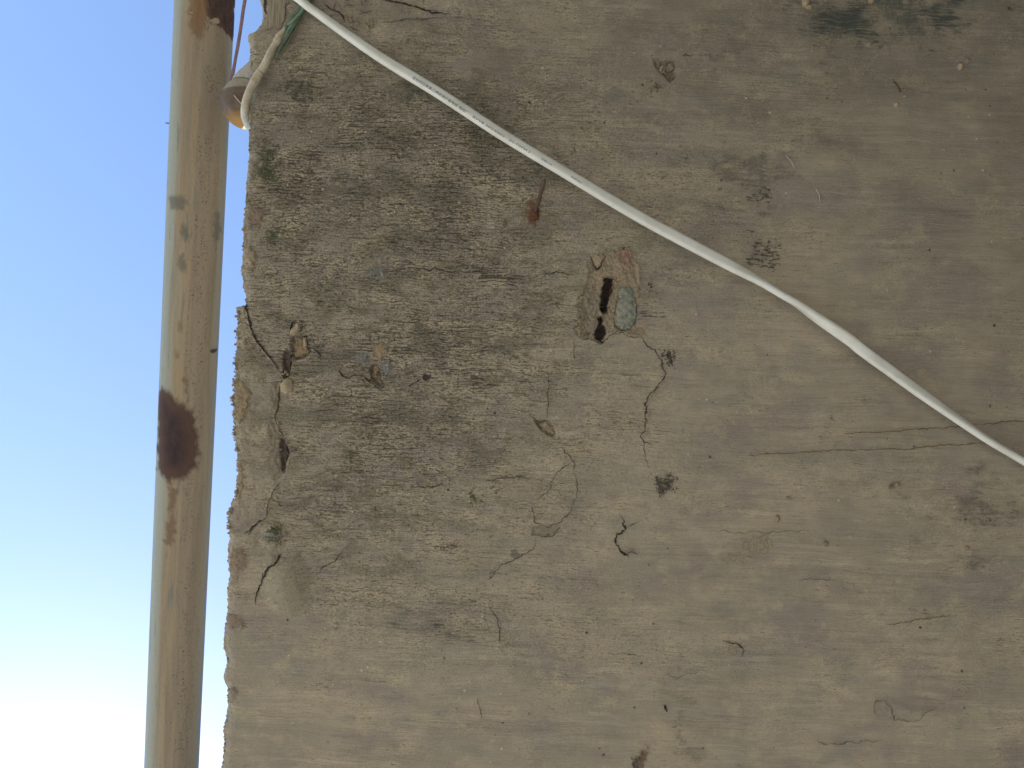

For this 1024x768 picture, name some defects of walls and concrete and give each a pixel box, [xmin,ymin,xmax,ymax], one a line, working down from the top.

spalling [574,247,644,343]
rust [157,389,198,544]
crack [241,305,291,544]
crack [255,554,280,603]
spalling [280,322,321,394]
crack [488,448,578,579]
crack [573,332,667,460]
crack [614,518,637,556]
crack [751,420,1024,456]